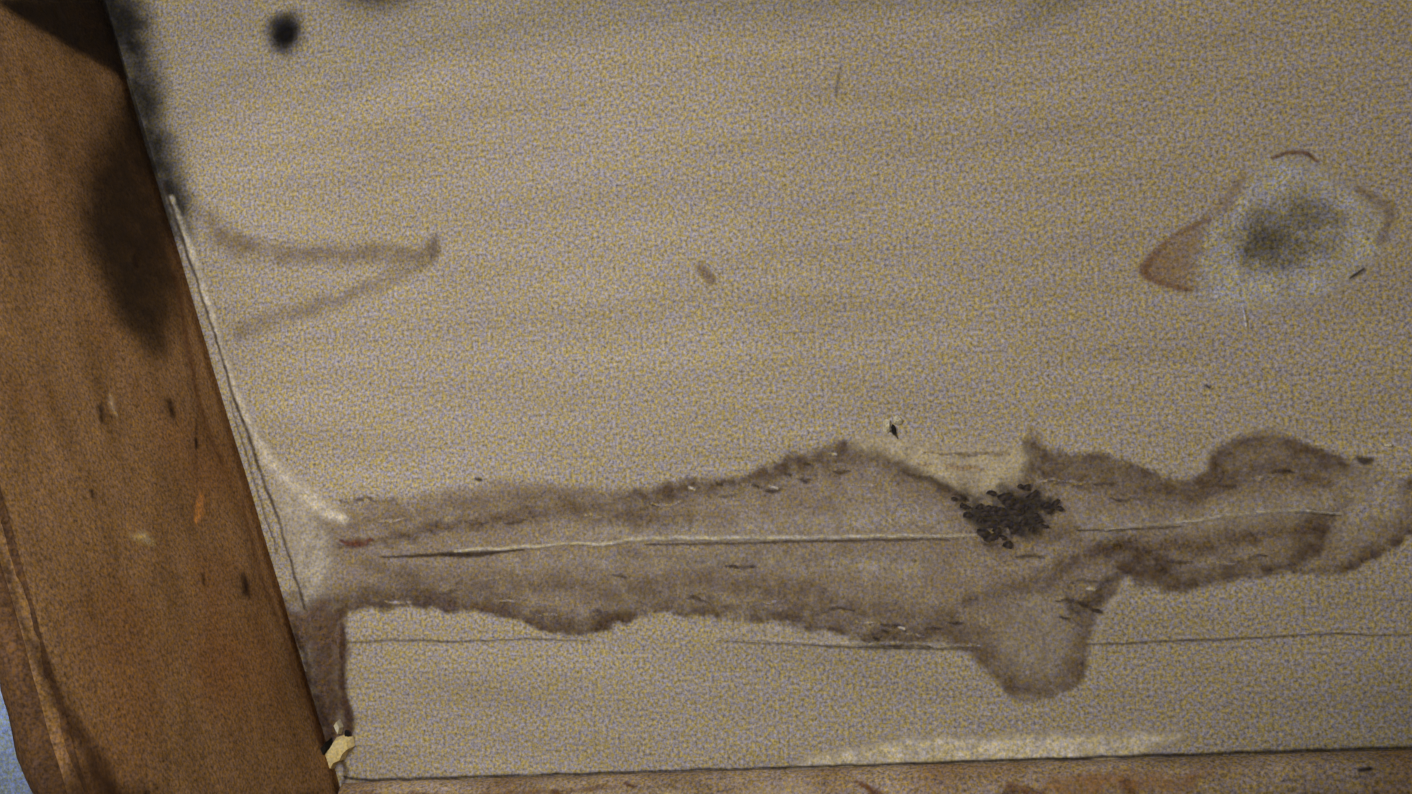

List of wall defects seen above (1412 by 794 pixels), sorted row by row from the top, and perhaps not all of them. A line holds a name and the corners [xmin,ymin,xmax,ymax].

water stain [750,441,867,492]
water stain [895,443,1082,557]
water stain [340,519,408,546]
water stain [1057,539,1236,619]
water stain [1343,531,1412,570]
water stain [750,601,992,663]
water stain [286,591,635,742]